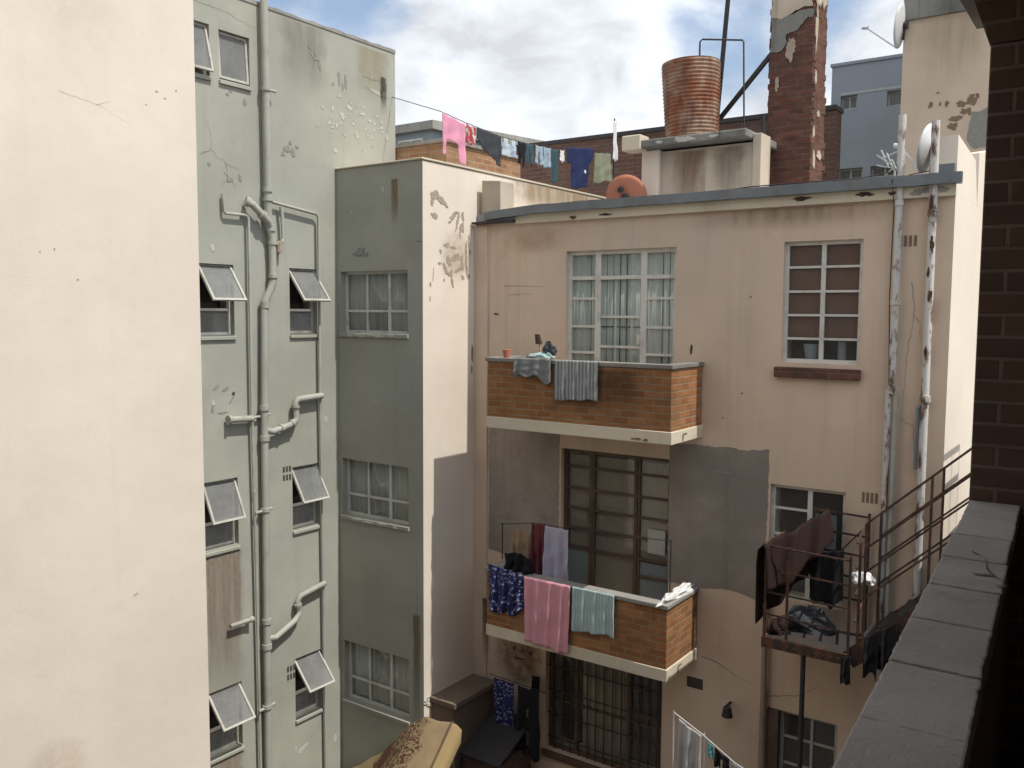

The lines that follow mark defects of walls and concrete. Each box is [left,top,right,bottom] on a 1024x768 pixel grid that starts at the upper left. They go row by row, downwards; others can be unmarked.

crack [201,124,242,186]
peeling [317,72,391,153]
peeling [812,110,821,169]
spalling [928,92,980,131]
peeling [429,189,471,301]